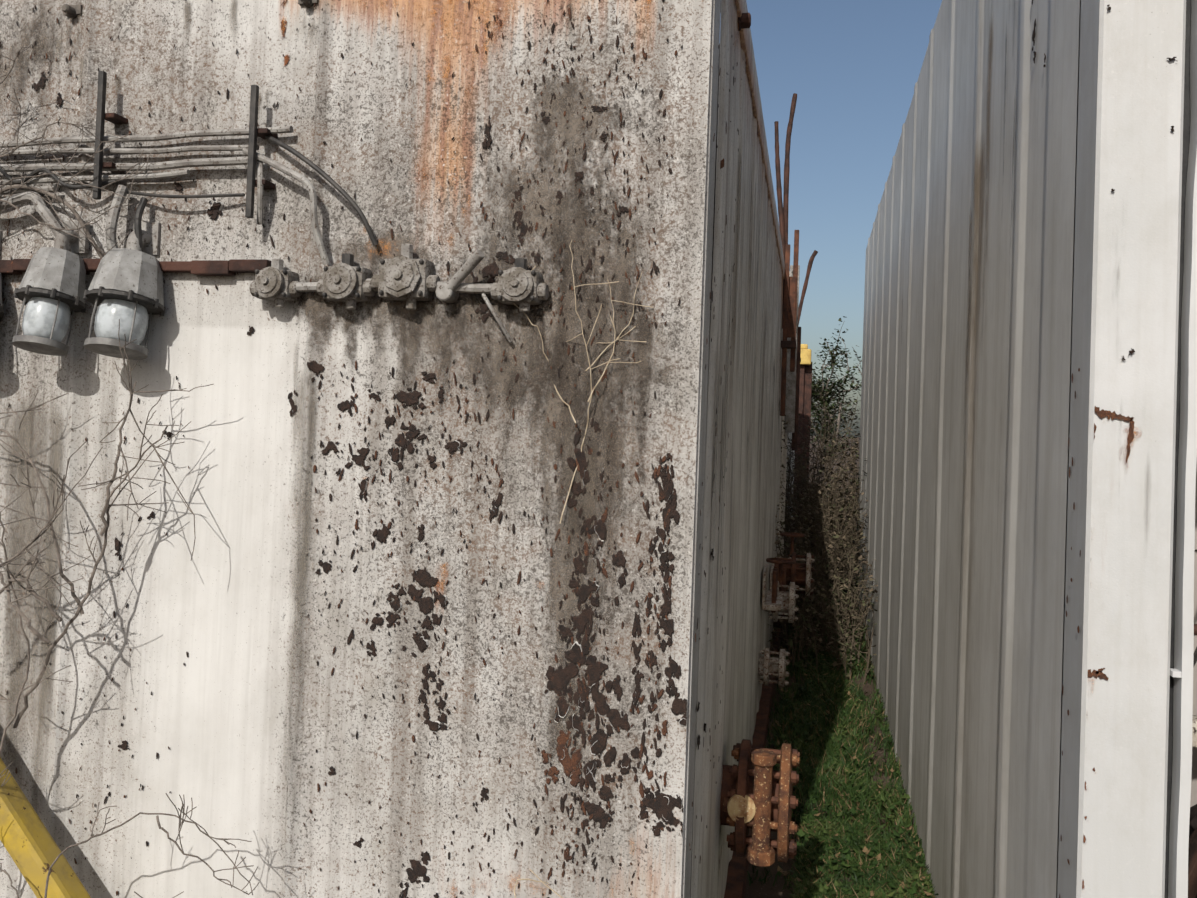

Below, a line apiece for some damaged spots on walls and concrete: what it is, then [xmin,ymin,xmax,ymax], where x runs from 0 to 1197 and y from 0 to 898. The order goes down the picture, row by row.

peeling [4,5,82,162]
peeling [162,174,299,248]
peeling [288,390,297,417]
peeling [306,0,719,898]
damp [507,230,635,607]
damp [638,315,652,447]